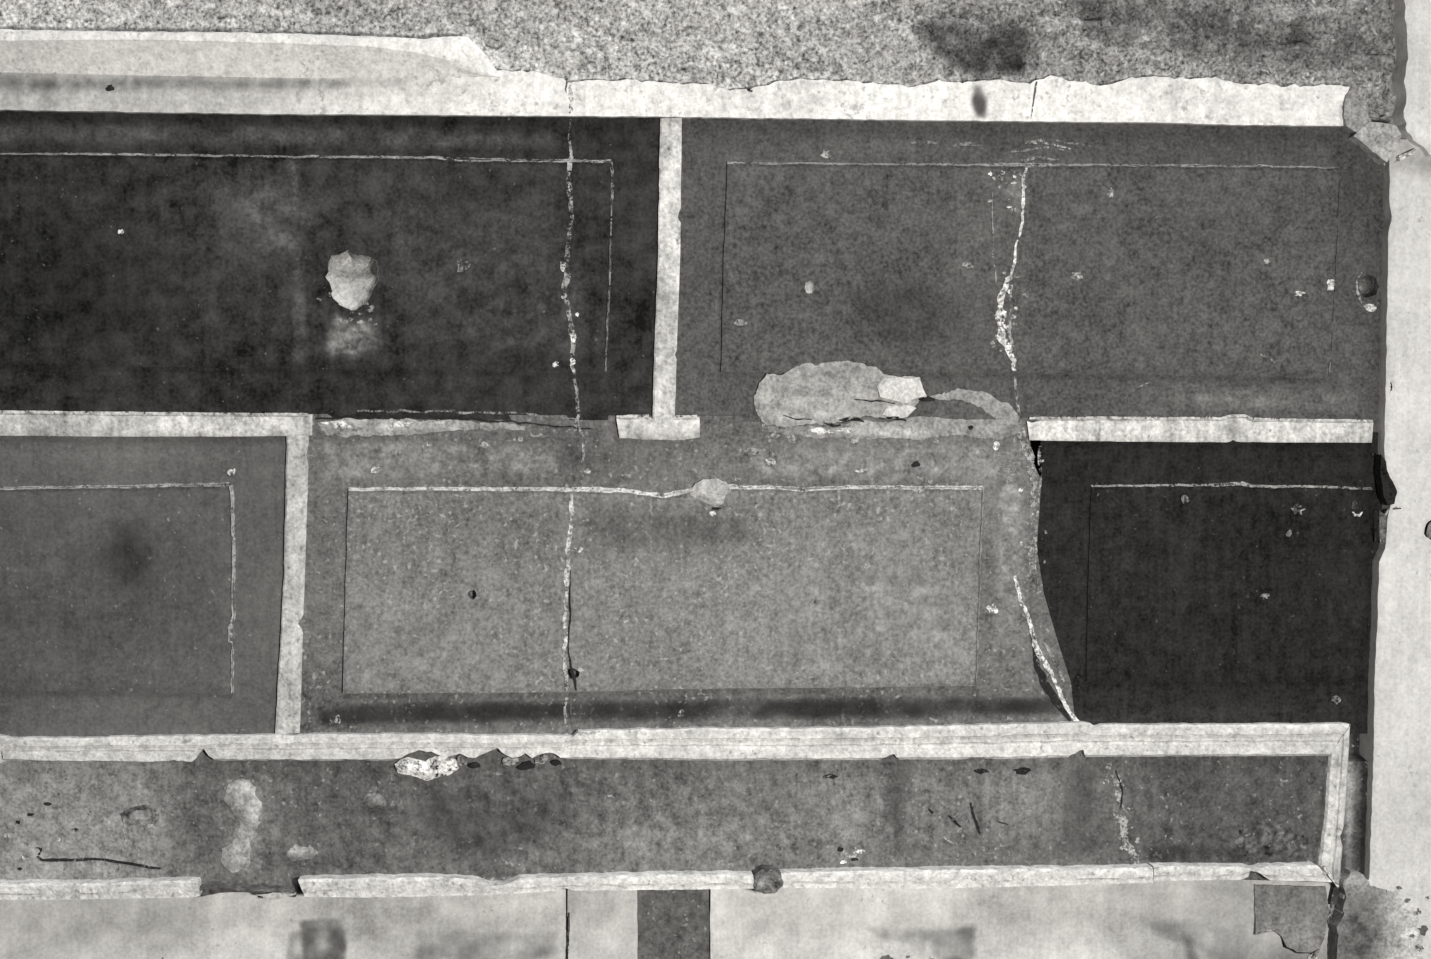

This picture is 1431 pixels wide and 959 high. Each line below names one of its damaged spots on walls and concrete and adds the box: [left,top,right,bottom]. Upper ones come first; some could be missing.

crack [553,79,591,730]
flaking render [744,361,1022,465]
crack [961,167,1079,721]
spalling [395,755,480,781]
spalling [502,754,562,770]
water stain [298,922,346,959]
flaking render [1253,868,1429,959]